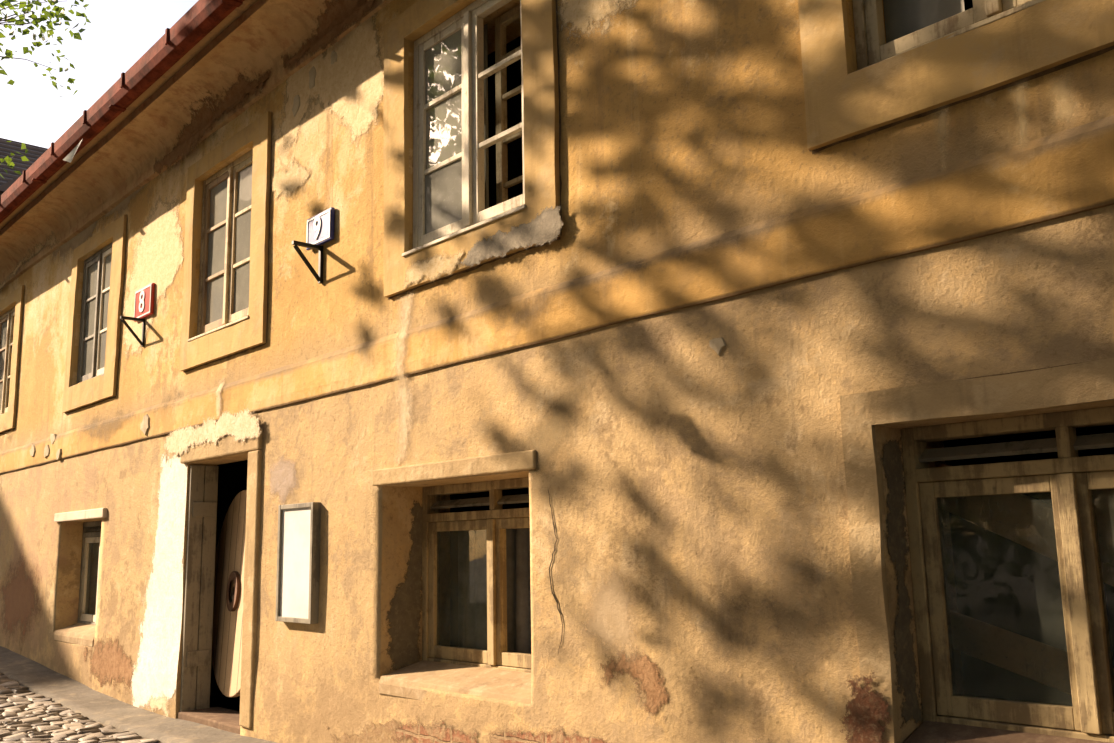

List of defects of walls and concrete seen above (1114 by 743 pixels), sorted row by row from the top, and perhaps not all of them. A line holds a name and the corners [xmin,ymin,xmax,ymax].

spalling [153,70,271,174]
peeling [271,0,384,199]
peeling [556,0,638,40]
peeling [403,206,563,288]
peeling [386,500,423,670]
crack [548,491,563,653]
peeling [839,437,923,743]
flaking render [327,714,608,743]